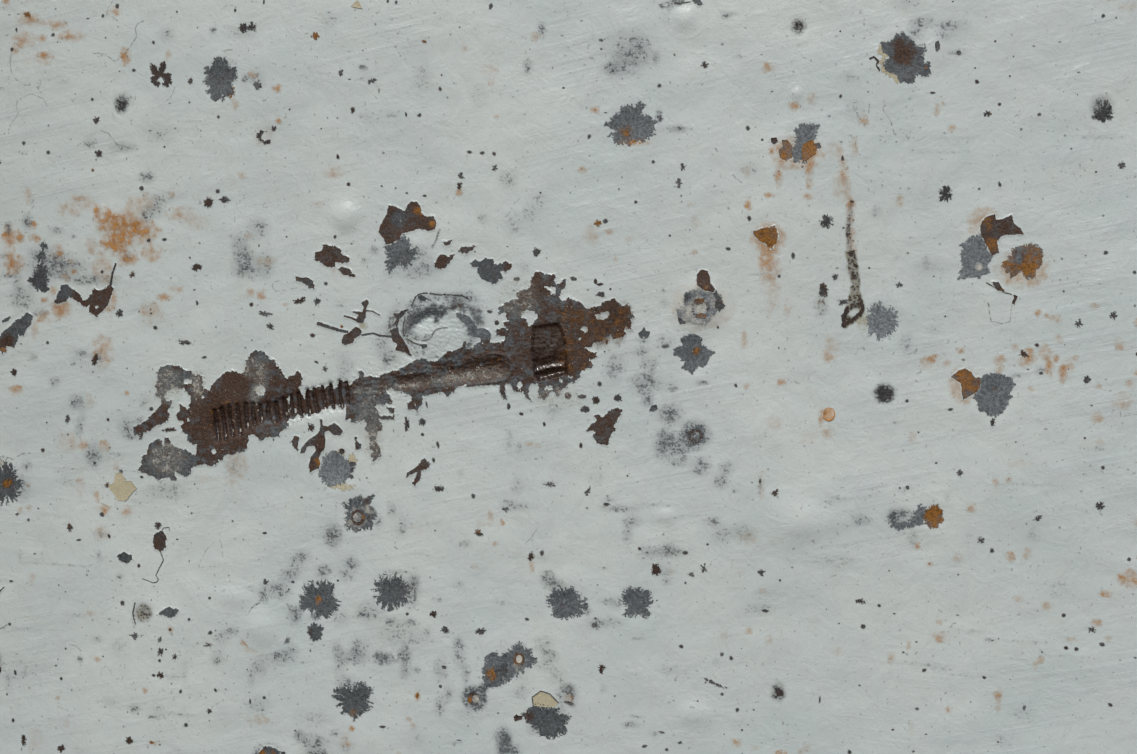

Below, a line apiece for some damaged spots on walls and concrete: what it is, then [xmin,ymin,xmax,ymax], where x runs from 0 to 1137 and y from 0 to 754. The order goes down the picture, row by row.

peeling [188,56,238,102]
peeling [604,101,663,146]
peeling [869,21,956,84]
peeling [0,242,123,356]
peeling [376,195,520,286]
spalling [662,268,726,382]
rust [837,201,864,328]
peeling [957,212,1043,307]
peeling [948,366,1016,426]
peeling [289,416,377,546]
peeling [291,580,341,641]
peeling [463,641,537,711]